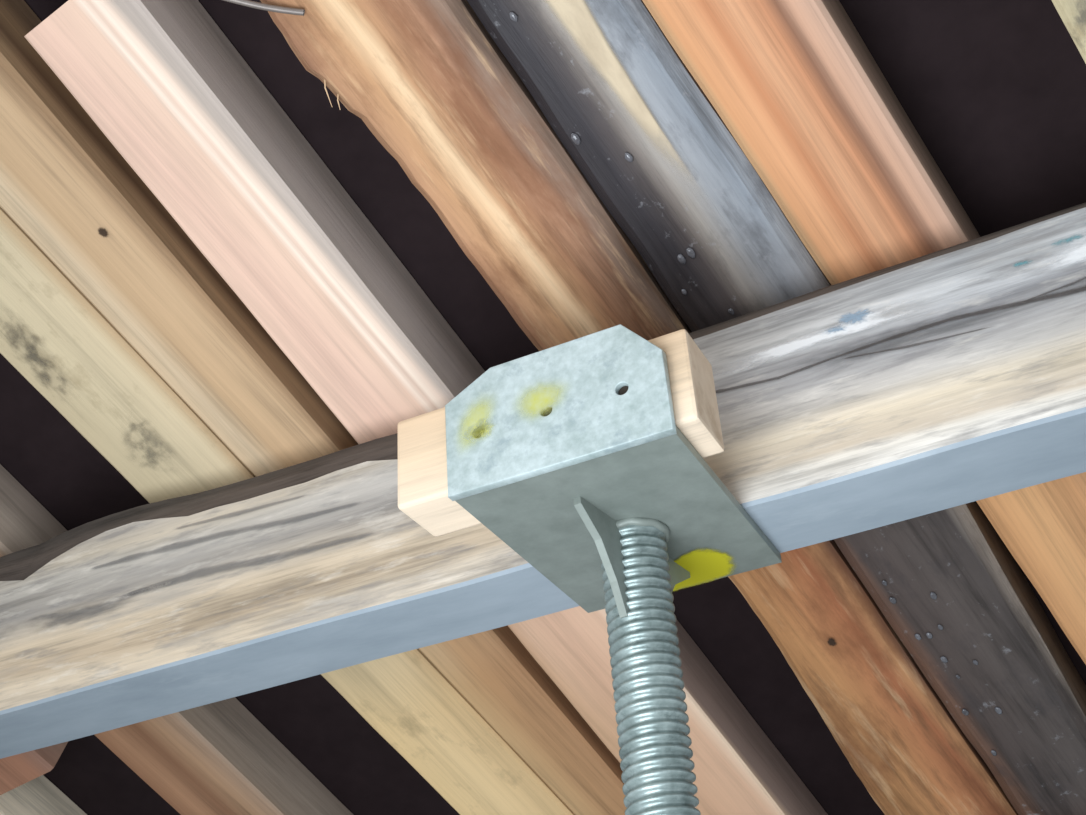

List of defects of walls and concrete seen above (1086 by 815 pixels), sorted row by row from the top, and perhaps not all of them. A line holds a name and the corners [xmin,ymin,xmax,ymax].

water stain [11,330,49,382]
crack [716,277,1086,393]